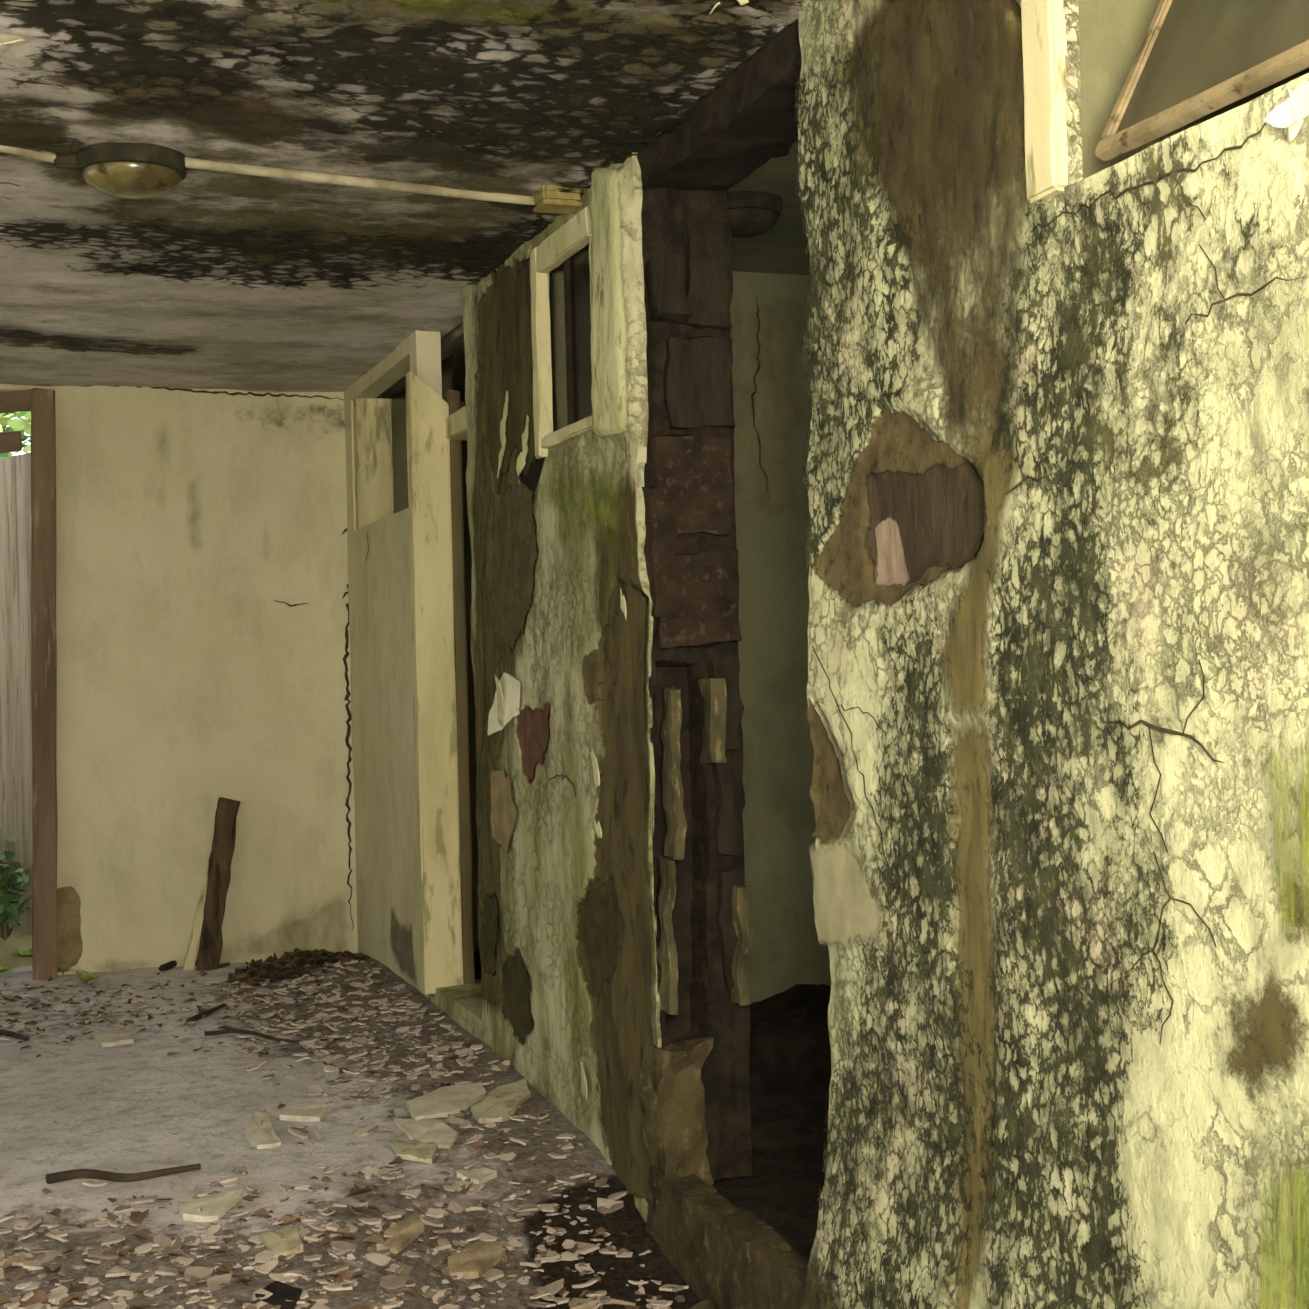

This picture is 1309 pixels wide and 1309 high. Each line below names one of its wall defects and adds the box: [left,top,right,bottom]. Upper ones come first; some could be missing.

leakage [0,0,804,291]
crack [1031,122,1305,324]
flaking render [475,257,538,651]
flaking render [815,403,985,608]
crack [341,528,369,930]
leakage [472,300,545,1011]
flaking render [488,672,550,854]
flaking render [806,697,850,845]
crack [812,646,890,868]
leakage [794,0,1284,1309]
crack [1100,660,1224,1044]
leakage [1215,963,1309,1120]